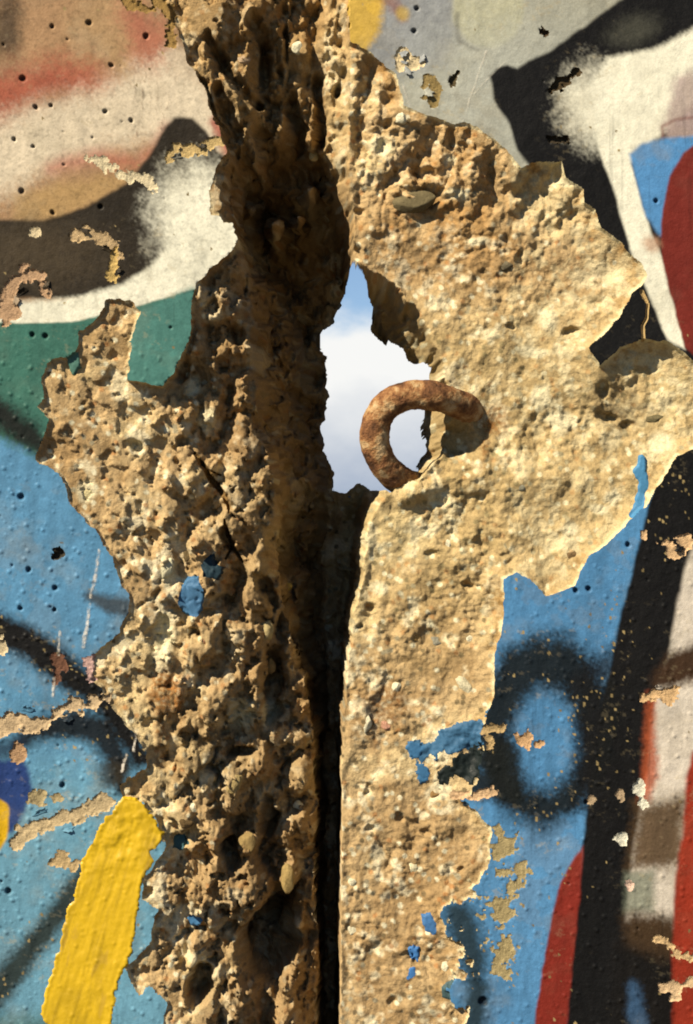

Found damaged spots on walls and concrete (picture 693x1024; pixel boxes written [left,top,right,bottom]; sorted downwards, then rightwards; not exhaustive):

spalling [0,0,350,1024]
crack [193,451,244,563]
spalling [333,16,693,1024]